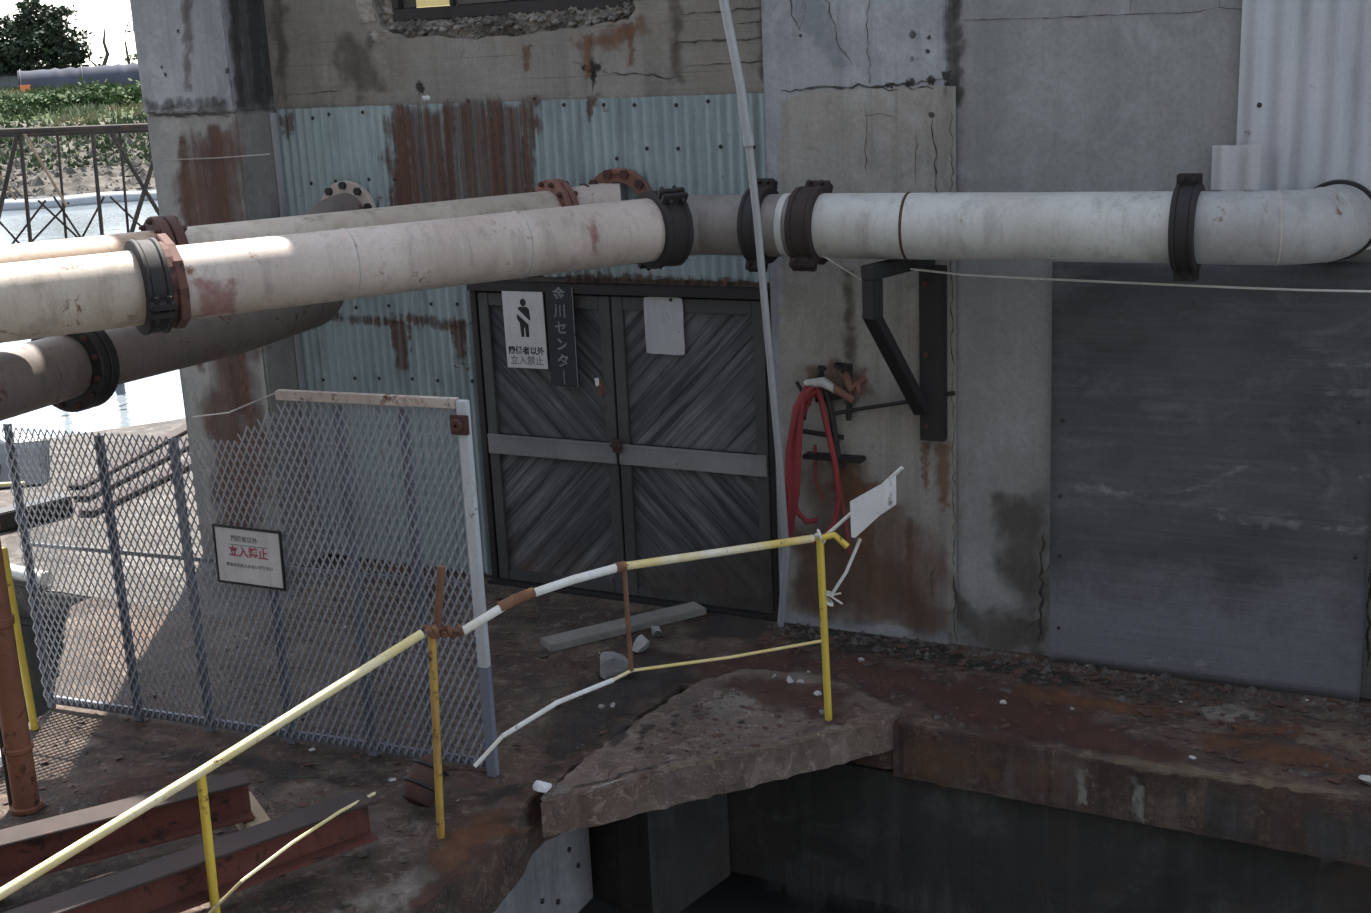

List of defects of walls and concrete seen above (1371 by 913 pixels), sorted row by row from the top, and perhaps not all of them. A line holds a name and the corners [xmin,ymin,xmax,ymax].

corrosion [179,126,243,227]
corrosion [382,95,540,206]
spalling [356,0,636,44]
crack [676,7,763,67]
crack [780,0,954,192]
damp [945,0,964,101]
corrosion [198,349,270,527]
crack [930,260,957,642]
corrosion [825,464,944,625]
damp [995,495,1041,597]
crack [1363,571,1371,667]
corrosion [701,646,1177,762]